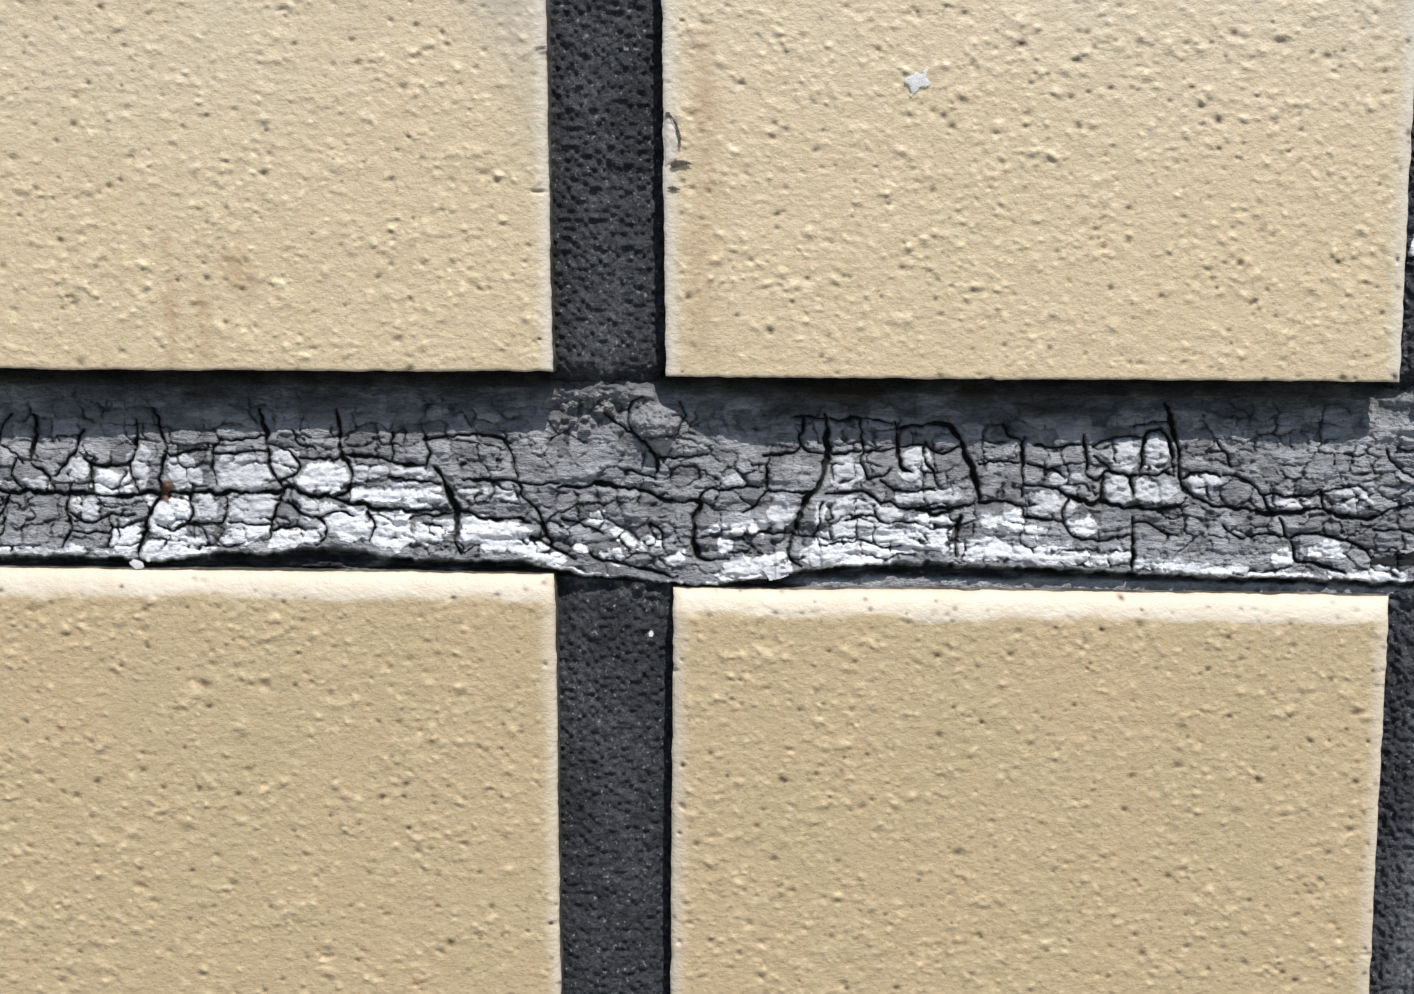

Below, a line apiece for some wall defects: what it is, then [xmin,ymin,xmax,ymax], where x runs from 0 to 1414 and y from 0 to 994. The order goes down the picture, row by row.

spalling [559,389,620,435]
crack [0,368,1414,597]
peeling [722,555,792,580]
spalling [1368,548,1414,567]